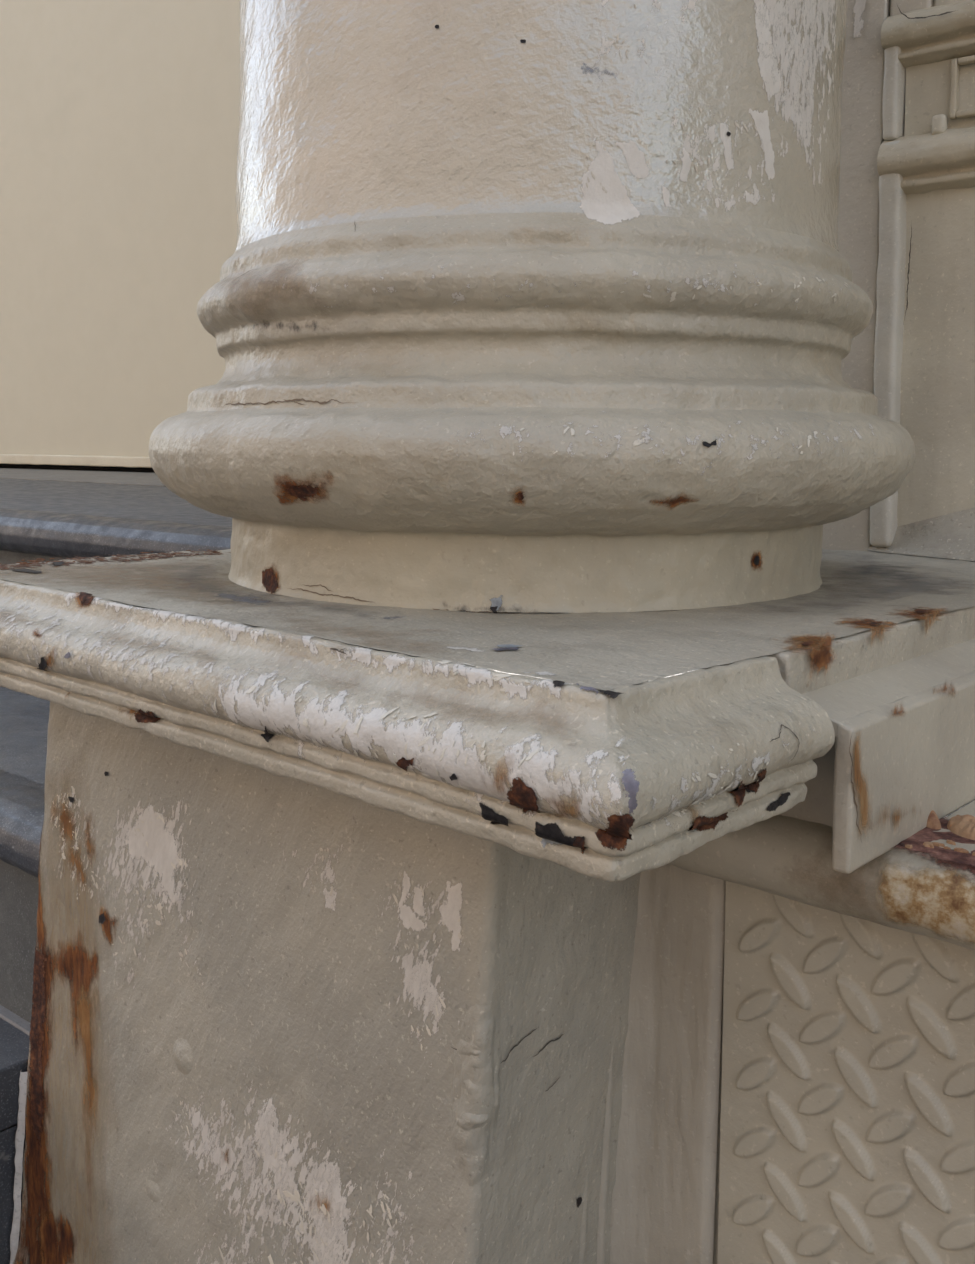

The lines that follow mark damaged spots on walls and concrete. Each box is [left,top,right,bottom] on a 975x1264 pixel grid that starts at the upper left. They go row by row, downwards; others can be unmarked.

peeling [661,0,837,212]
corrosion [0,548,231,572]
corrosion [275,476,331,504]
peeling [65,592,622,700]
corrosion [789,635,834,671]
corrosion [839,608,946,642]
peeling [203,662,770,854]
corrosion [15,776,115,1264]
peeling [91,794,204,1001]
peeling [376,871,465,1067]
corrosion [878,810,975,943]
peeling [166,1073,436,1264]